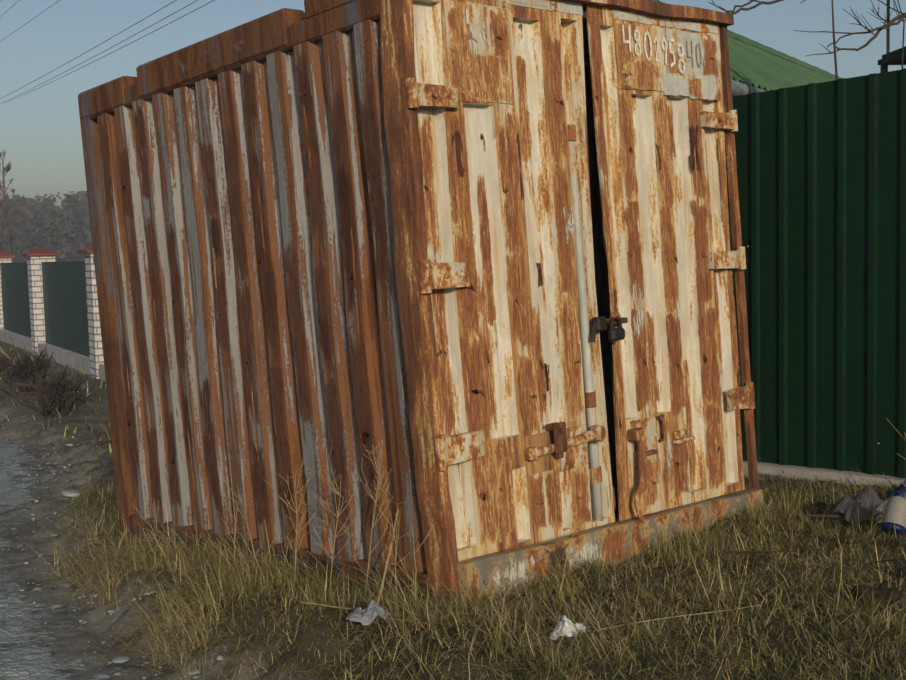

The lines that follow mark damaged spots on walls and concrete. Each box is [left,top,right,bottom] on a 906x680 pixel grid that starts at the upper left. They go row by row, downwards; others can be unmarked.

peeling [464,8,492,56]
rust [98,106,195,507]
rust [201,142,231,381]
rust [296,47,349,535]
rust [418,115,442,263]
rust [432,0,552,544]
rust [529,470,562,533]
rust [543,32,584,428]
peeling [563,206,574,243]
rust [590,9,618,313]
rust [608,340,632,507]
peeling [633,281,647,339]